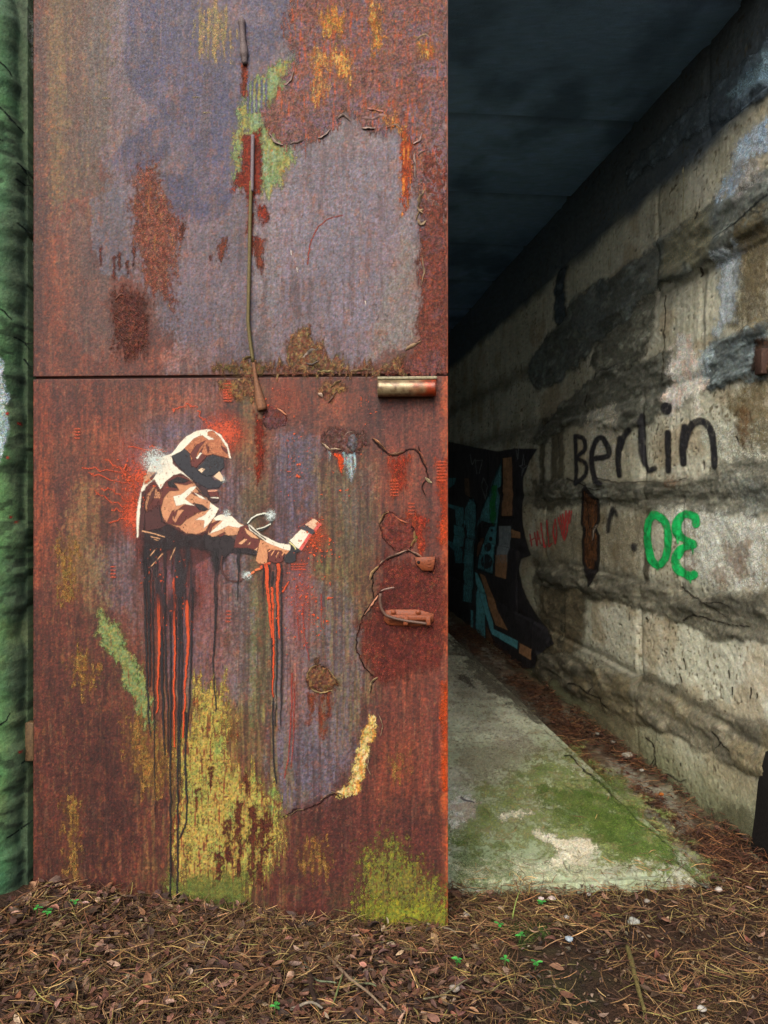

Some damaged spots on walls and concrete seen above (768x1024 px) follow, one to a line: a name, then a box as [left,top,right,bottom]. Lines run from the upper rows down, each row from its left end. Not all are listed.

rust [240,63,248,97]
rust [99,159,189,320]
rust [232,128,270,275]
peeling [211,0,447,404]
rust [398,124,415,216]
water stain [658,203,768,463]
rust [253,411,267,483]
peeling [321,426,370,480]
crack [372,438,432,495]
crack [355,549,422,692]
rust [359,461,447,686]
rust [439,684,447,791]